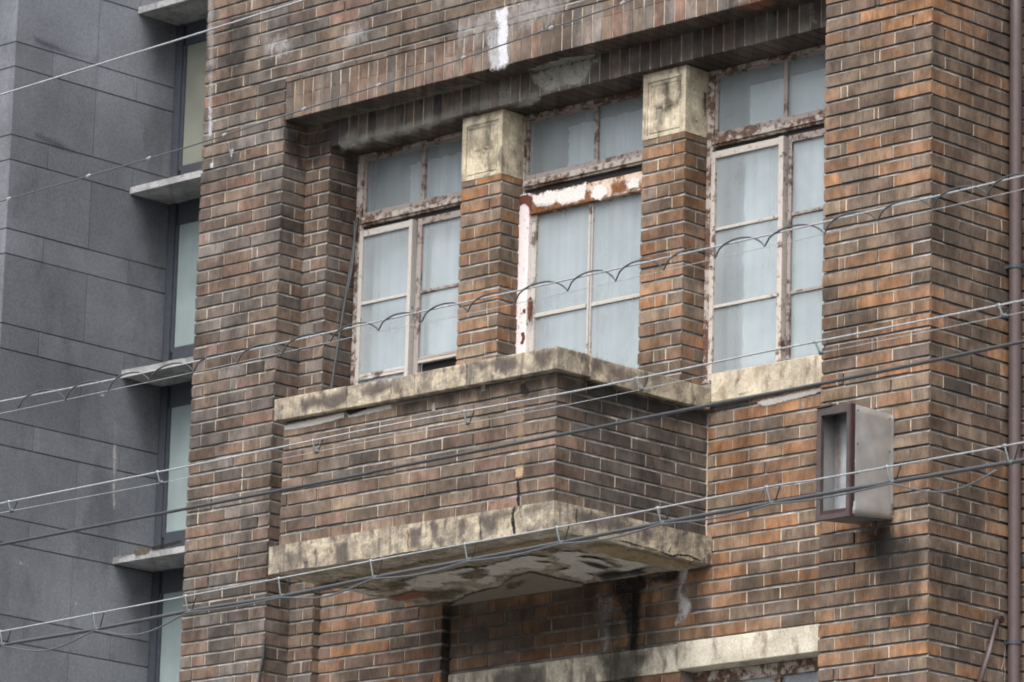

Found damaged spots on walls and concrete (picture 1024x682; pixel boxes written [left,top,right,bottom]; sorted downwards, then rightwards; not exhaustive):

damp [488,7,508,69]
peeling [518,177,640,211]
peeling [520,297,532,344]
damp [478,357,516,371]
damp [534,350,551,363]
damp [302,391,345,408]
damp [362,383,399,394]
damp [566,381,698,421]
crack [511,478,522,534]
damp [611,569,691,651]